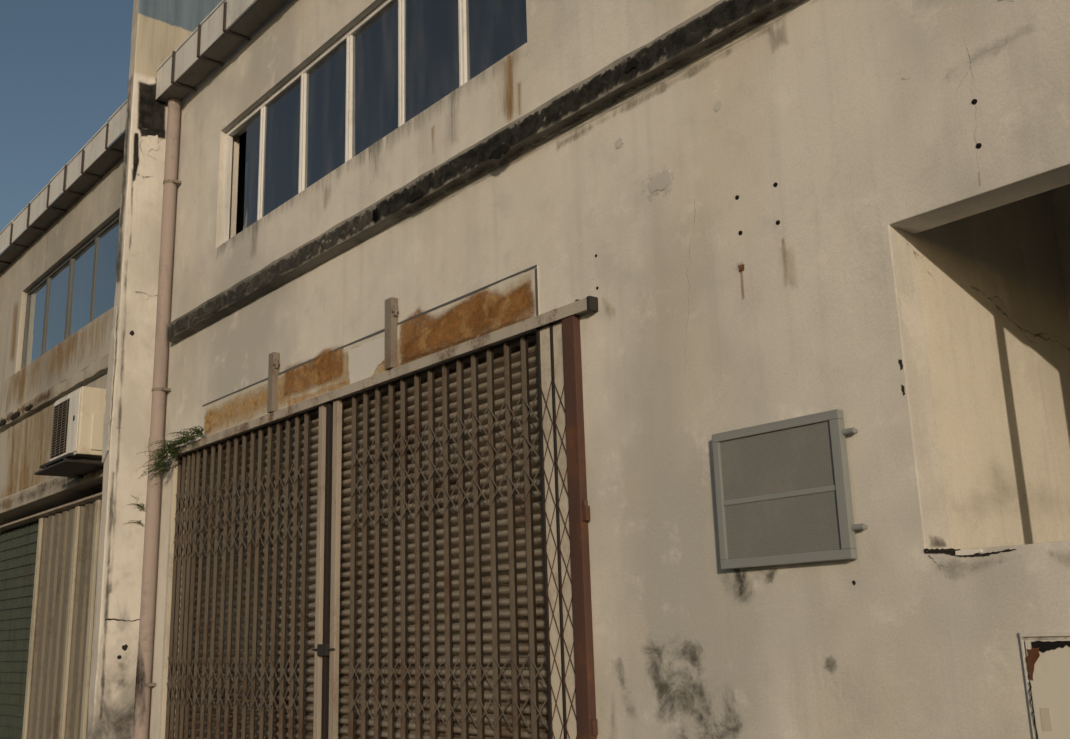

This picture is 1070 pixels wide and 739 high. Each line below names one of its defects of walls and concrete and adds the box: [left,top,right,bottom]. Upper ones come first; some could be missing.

leakage [116,78,165,287]
rust [372,284,534,376]
rust [205,348,349,433]